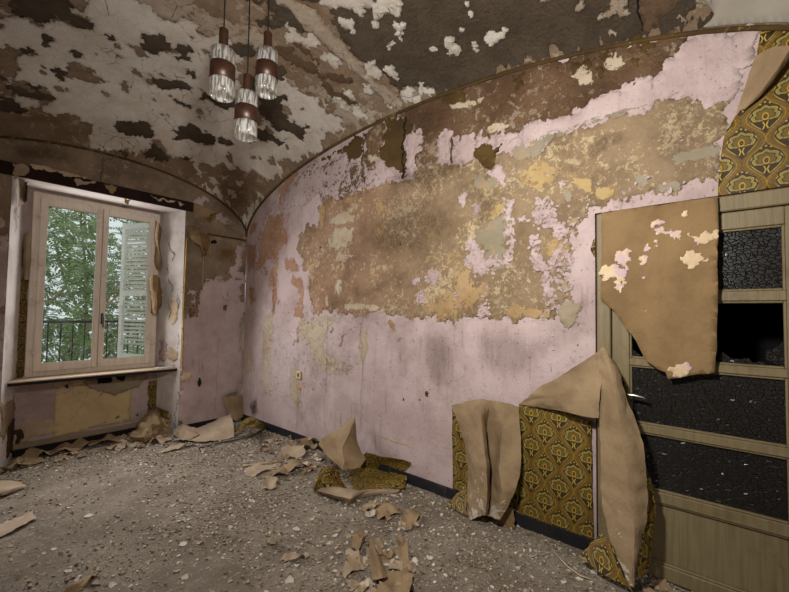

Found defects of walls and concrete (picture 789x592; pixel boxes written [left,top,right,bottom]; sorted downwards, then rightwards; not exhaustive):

peeling [0,0,789,425]
peeling [0,395,24,458]